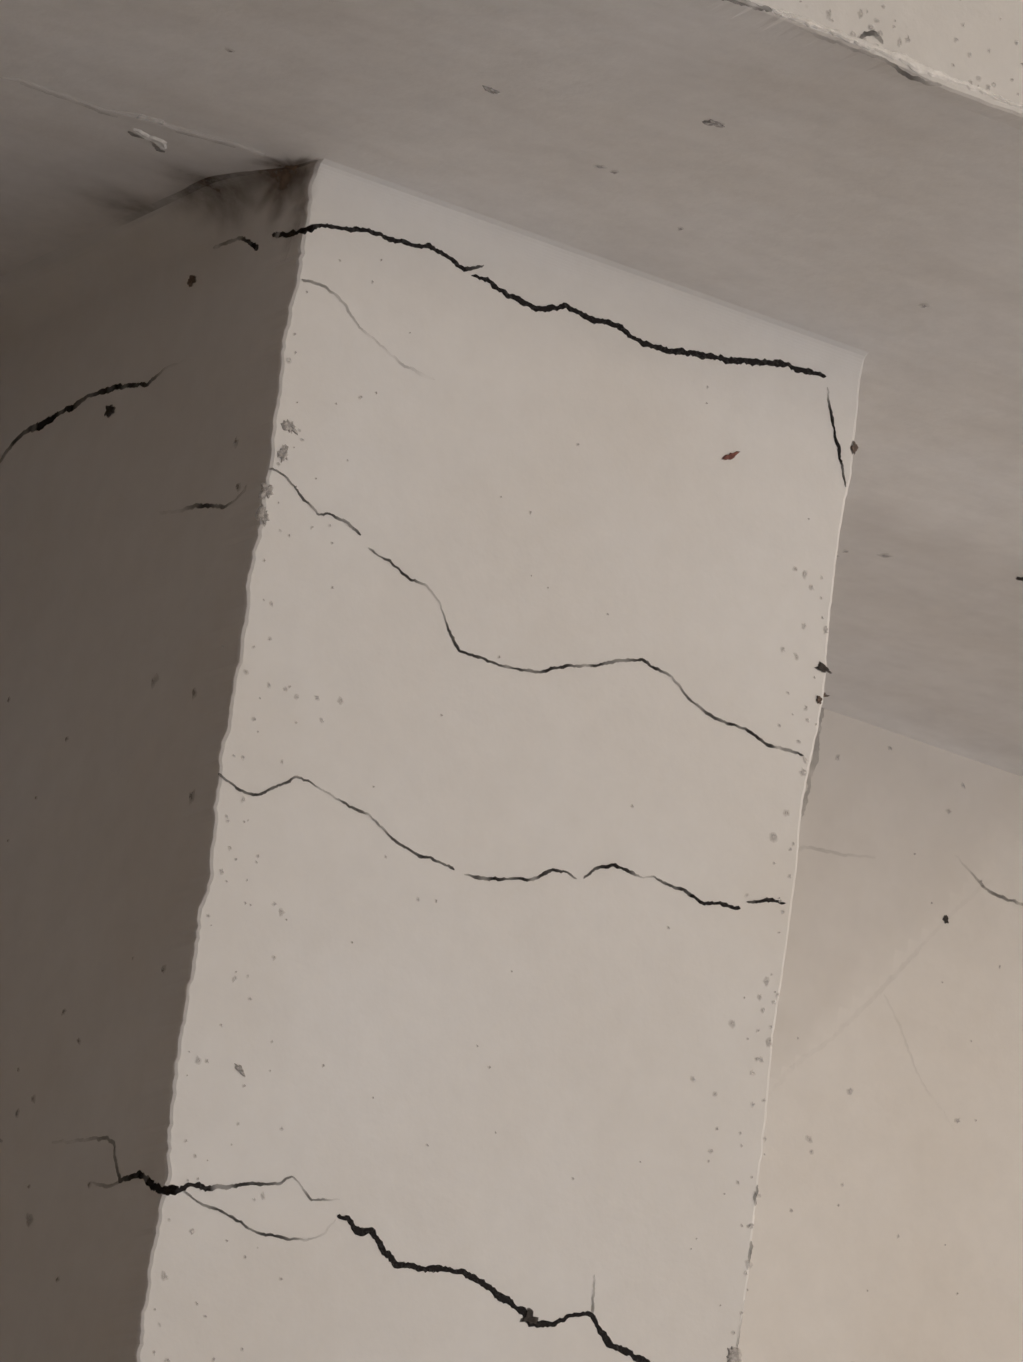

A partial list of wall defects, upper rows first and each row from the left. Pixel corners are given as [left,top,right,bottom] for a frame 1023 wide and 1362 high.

crack [242,223,846,487]
crack [11,380,150,446]
crack [197,502,224,510]
crack [270,468,417,583]
crack [445,622,804,756]
crack [218,773,313,796]
crack [341,800,786,910]
crack [117,1170,650,1362]